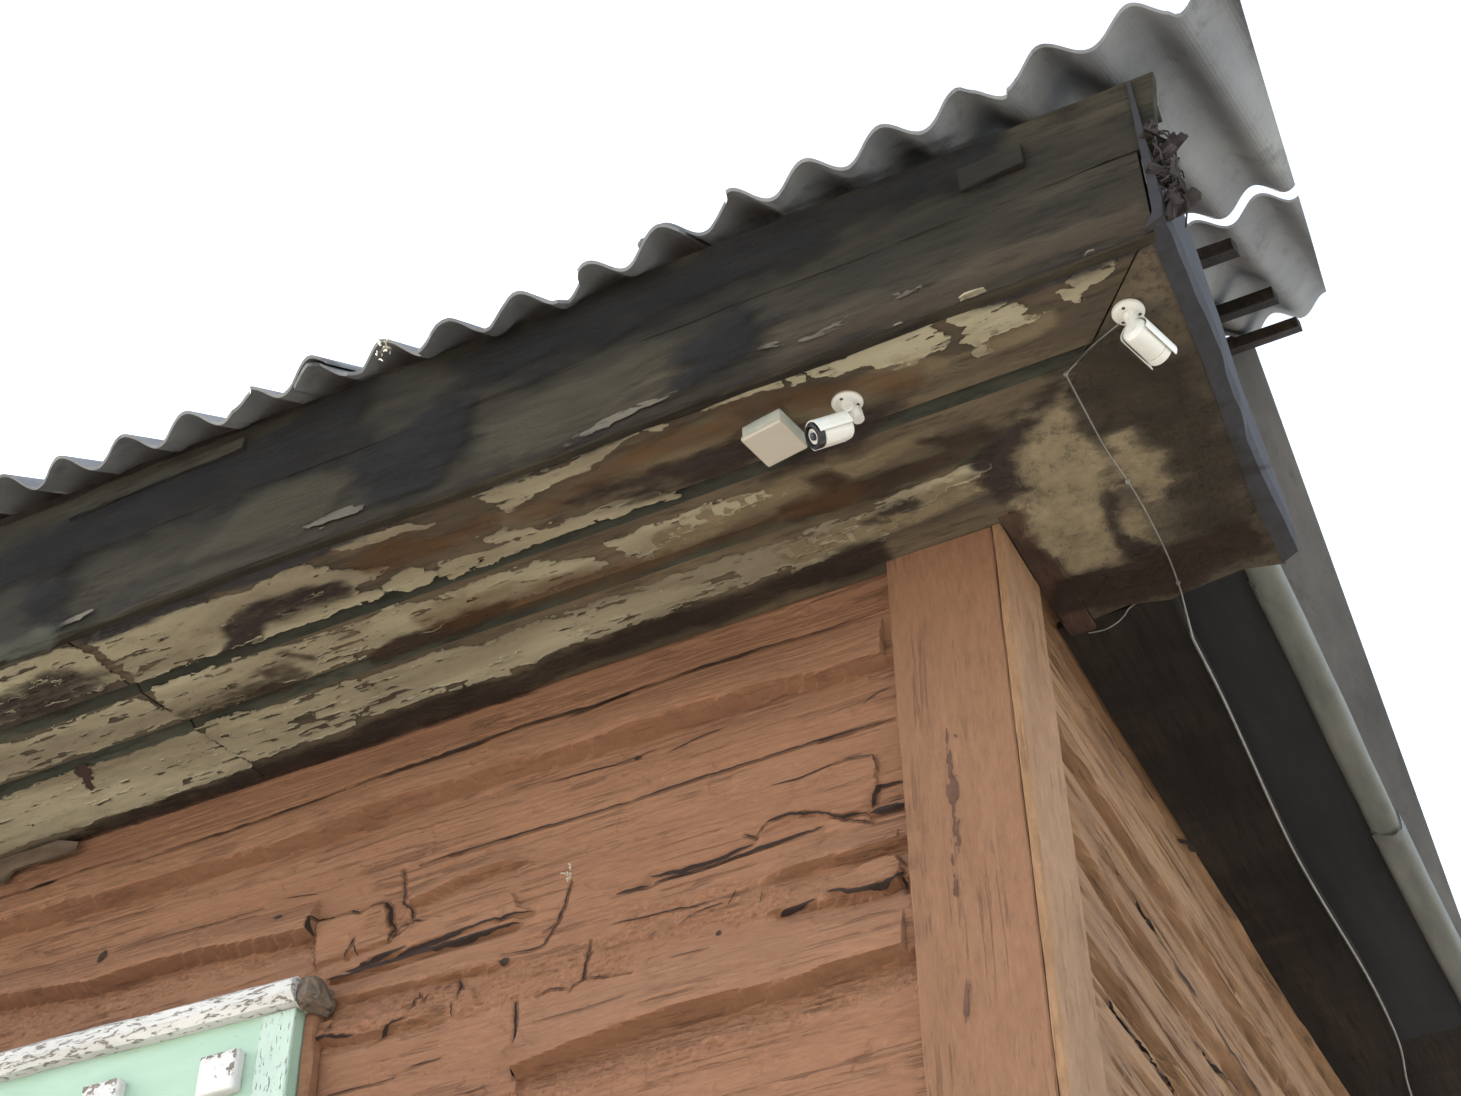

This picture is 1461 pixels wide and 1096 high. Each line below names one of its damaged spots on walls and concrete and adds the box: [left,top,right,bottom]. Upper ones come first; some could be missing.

water stain [0,132,1001,644]
peeling [701,287,1046,411]
water stain [966,234,1147,309]
peeling [1055,249,1118,303]
crack [2,610,876,897]
peeling [0,390,991,898]
crack [116,686,909,1096]
water stain [29,339,1270,850]
peeling [82,1078,117,1096]
peeling [200,1048,237,1075]